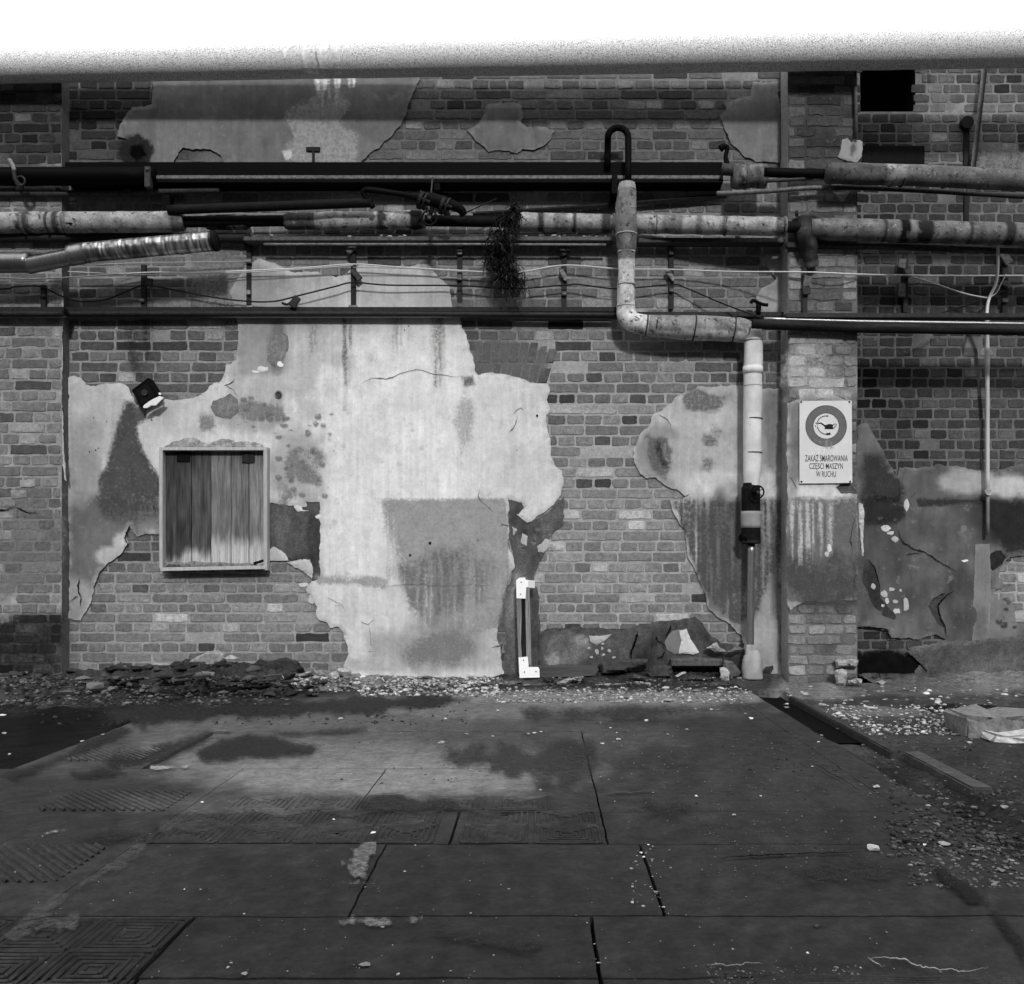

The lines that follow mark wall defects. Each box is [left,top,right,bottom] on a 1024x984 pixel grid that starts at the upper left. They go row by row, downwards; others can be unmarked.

flaking render [117,77,420,162]
crack [363,369,459,383]
leakage [96,401,159,517]
flaking render [68,258,564,678]
leakage [317,515,487,667]
leakage [789,500,833,569]
flaking render [633,385,1024,674]